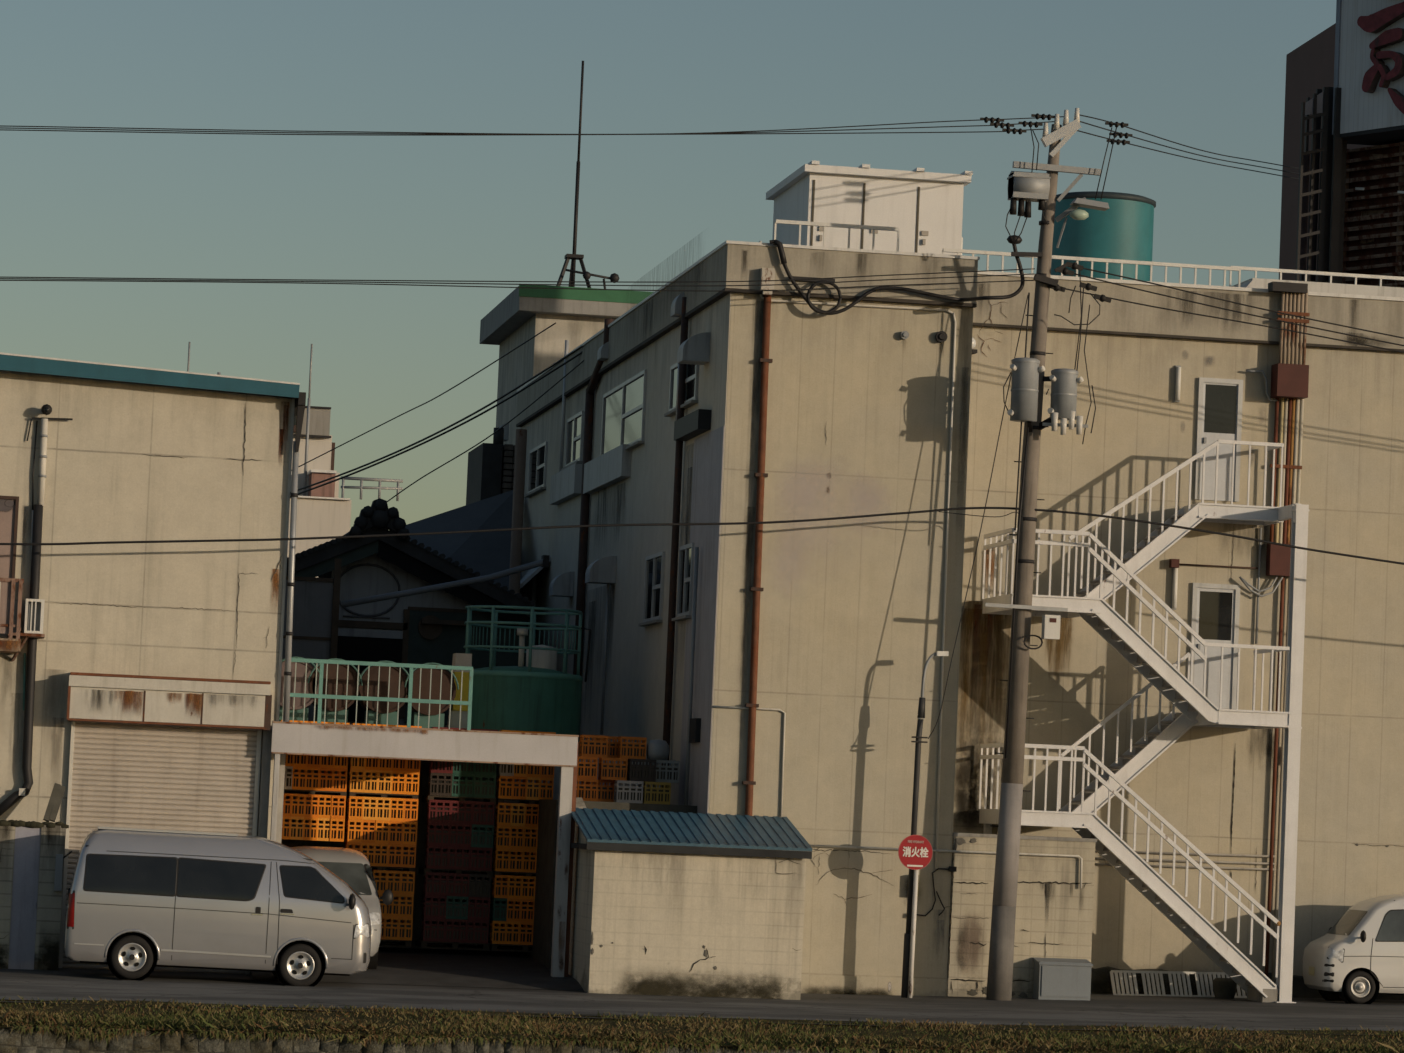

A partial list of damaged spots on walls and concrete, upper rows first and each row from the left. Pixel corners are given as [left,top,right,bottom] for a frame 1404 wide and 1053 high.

water stain [961,608,1007,725]
rust [116,690,141,708]
rust [169,693,202,711]
crack [775,847,889,903]